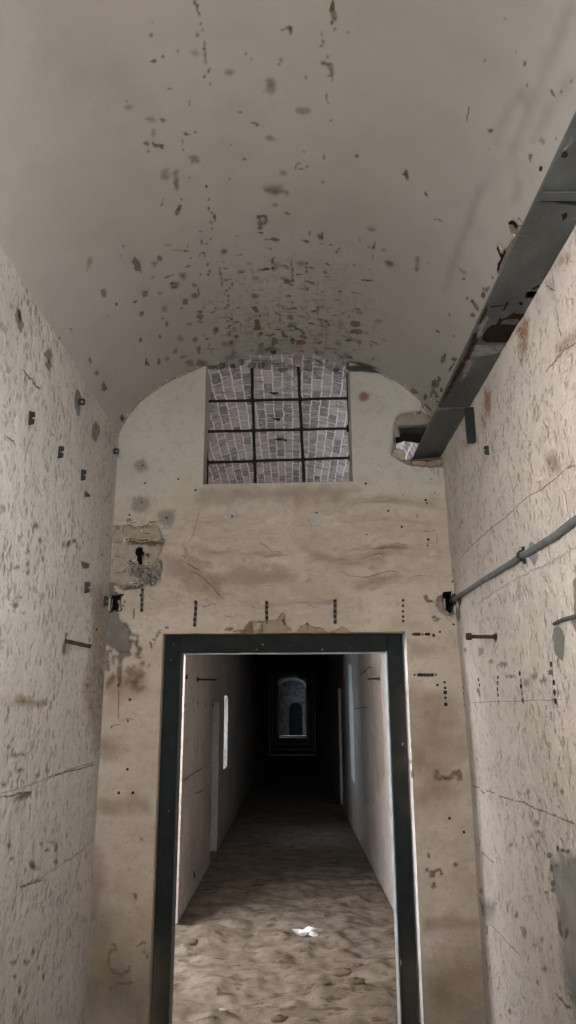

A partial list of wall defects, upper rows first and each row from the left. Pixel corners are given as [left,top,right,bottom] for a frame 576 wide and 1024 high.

spalling [392,218,523,480]
rust [443,285,539,401]
crack [463,462,575,555]
flaking render [101,518,168,671]
flaking render [225,613,351,651]
crack [0,764,96,798]
crack [472,785,576,825]